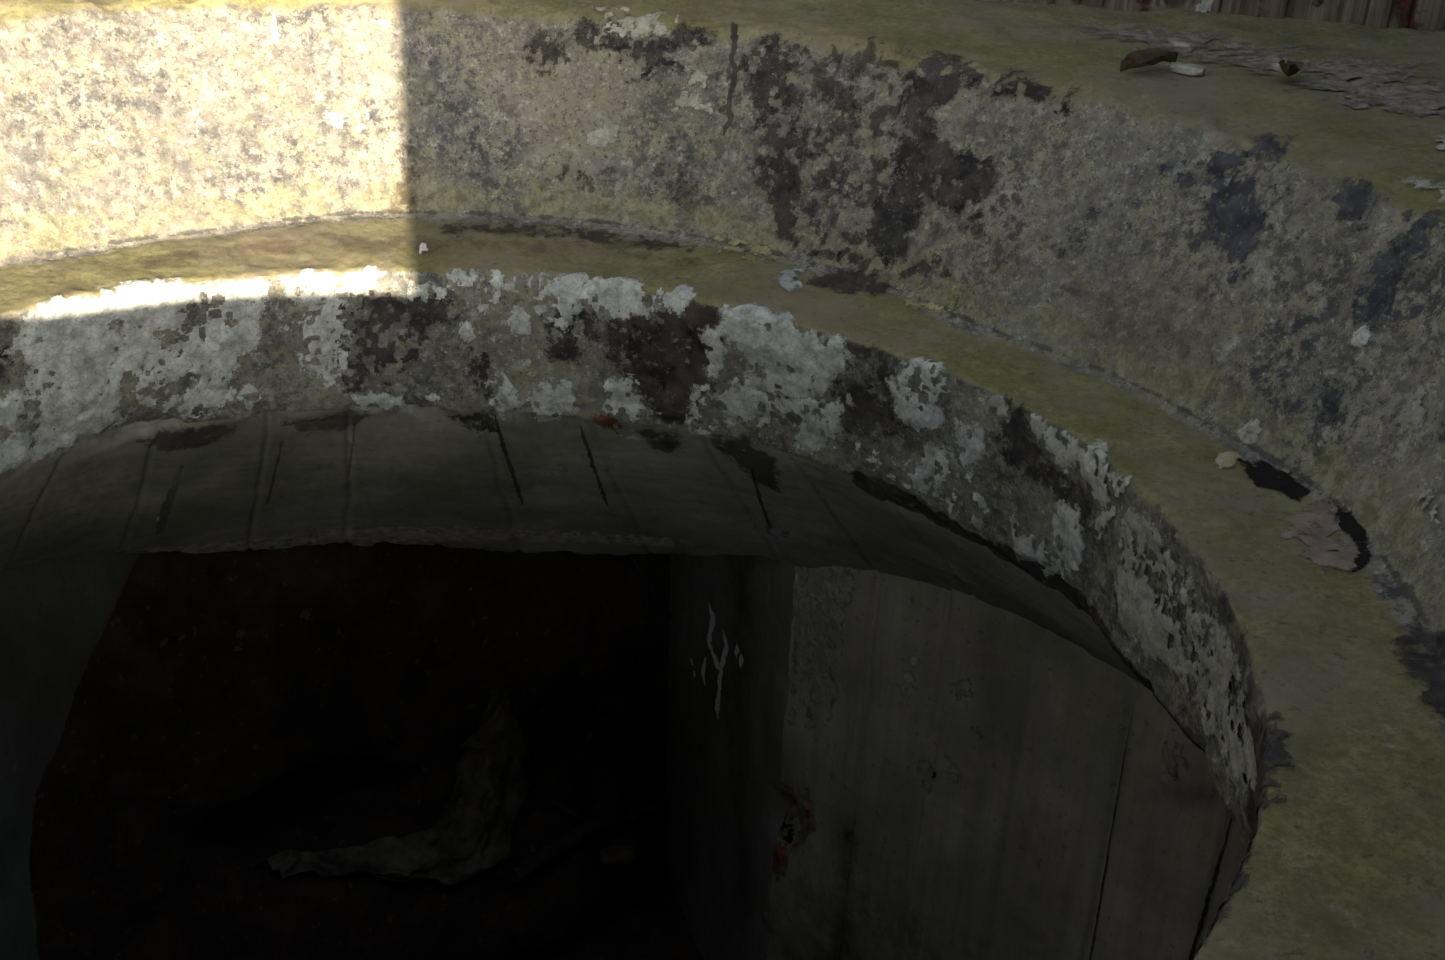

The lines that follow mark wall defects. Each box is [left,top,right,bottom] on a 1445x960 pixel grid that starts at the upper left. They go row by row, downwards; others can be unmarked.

leakage [521,13,718,84]
corrosion [1395,0,1423,31]
leakage [742,32,1082,296]
leakage [1151,132,1294,284]
leakage [448,340,501,433]
leakage [539,300,781,493]
crack [495,414,524,505]
crack [580,425,608,506]
crack [751,471,773,528]